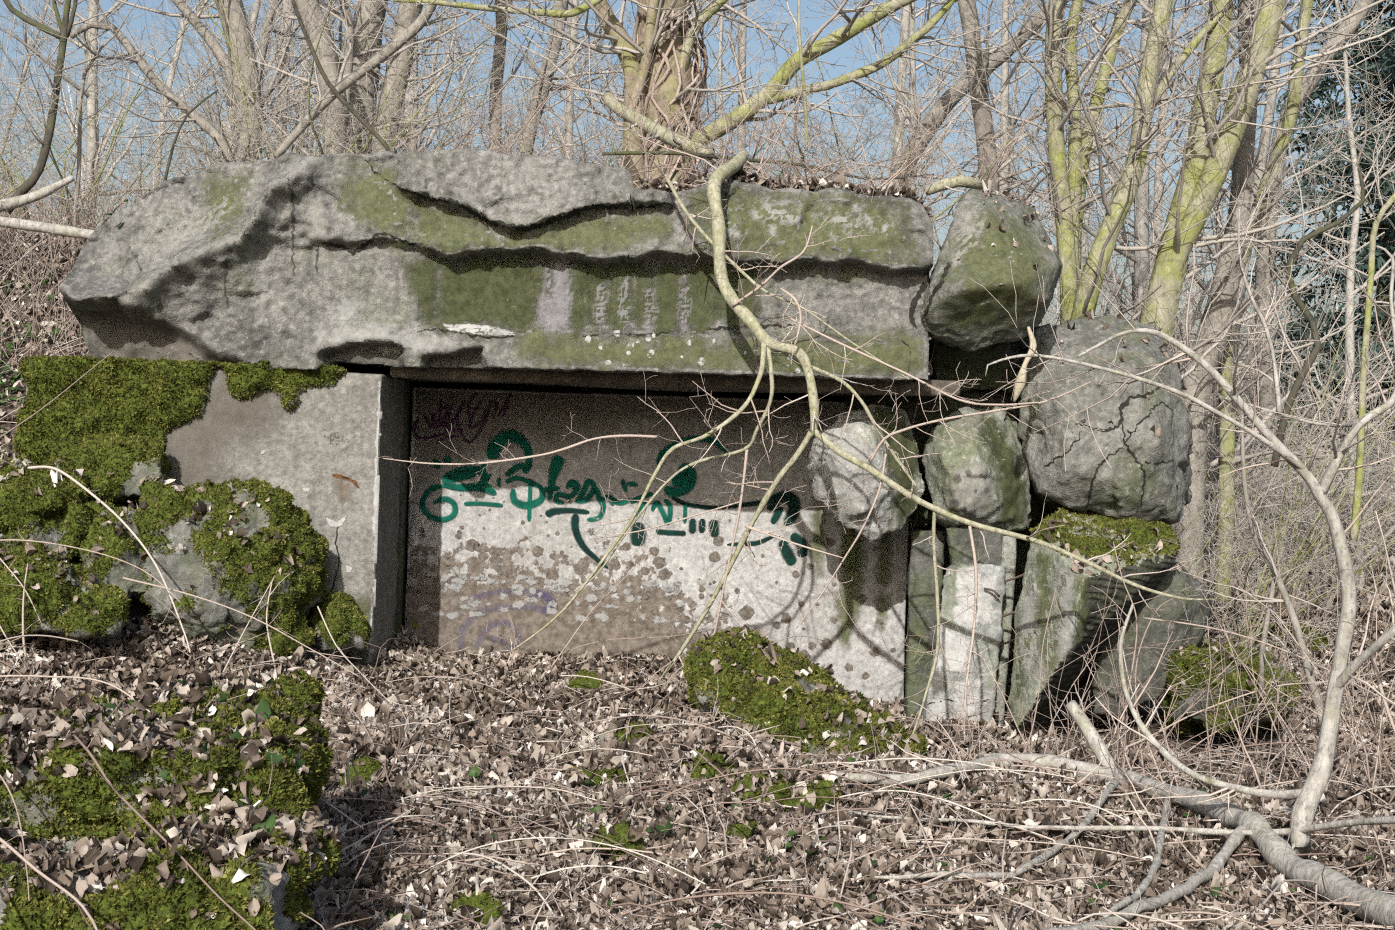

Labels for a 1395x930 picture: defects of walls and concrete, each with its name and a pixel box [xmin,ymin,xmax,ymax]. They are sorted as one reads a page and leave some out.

water stain [314,298,515,354]
water stain [405,259,434,318]
water stain [537,260,758,366]
crack [1044,387,1174,515]
water stain [810,427,891,644]